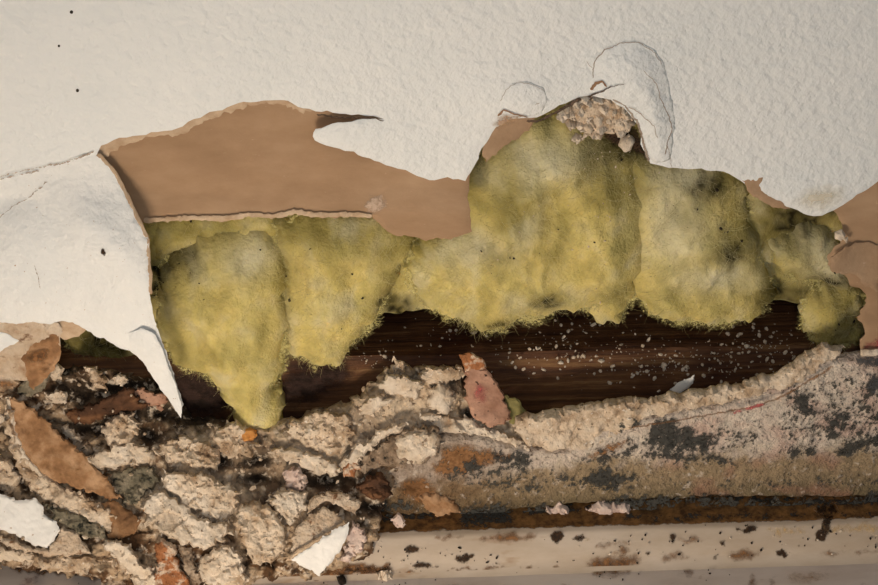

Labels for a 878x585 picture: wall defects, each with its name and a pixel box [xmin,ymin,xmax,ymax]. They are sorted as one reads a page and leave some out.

spalling [556,96,646,156]
crack [0,151,94,218]
peeling [0,153,183,418]
spalling [514,342,845,452]
damp [378,356,878,543]
peeling [0,494,60,548]
damp [455,553,474,571]